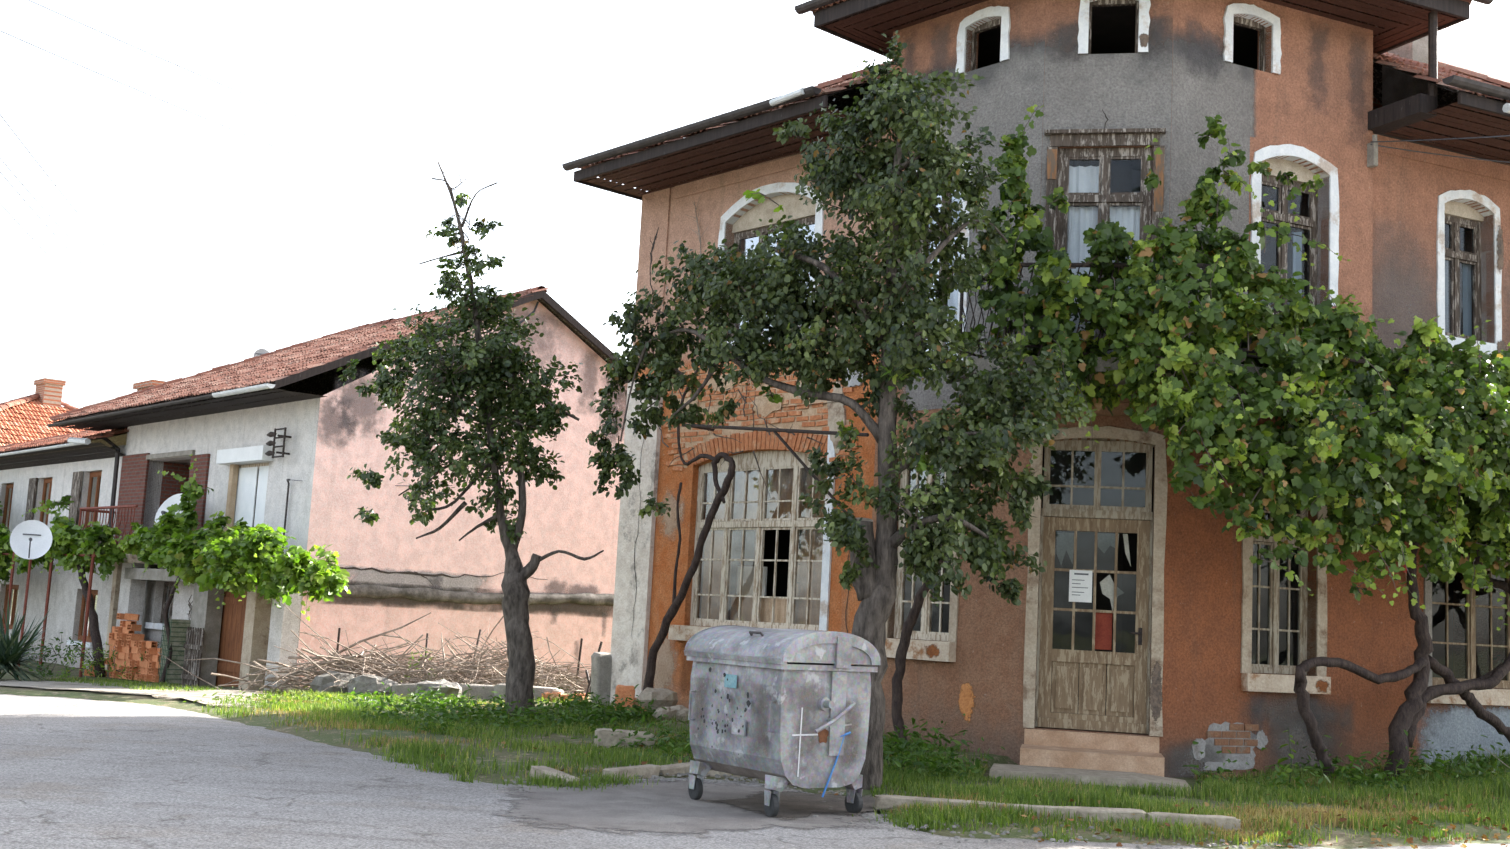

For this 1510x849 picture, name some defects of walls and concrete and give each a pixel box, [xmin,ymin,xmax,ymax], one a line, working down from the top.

flaking render [662,345,863,471]
flaking render [1191,721,1268,771]